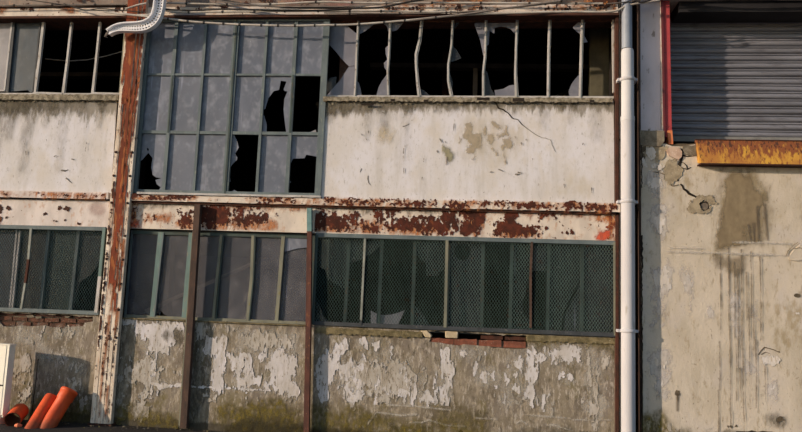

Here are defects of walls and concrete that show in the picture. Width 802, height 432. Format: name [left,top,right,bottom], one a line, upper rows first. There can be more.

corrosion [115,0,147,22]
corrosion [386,0,496,12]
corrosion [544,0,617,11]
crack [495,103,555,151]
corrosion [36,33,618,417]
spalling [640,144,697,241]
spalling [687,194,717,214]
peeling [0,225,184,423]
peeling [191,322,300,406]
peeling [314,333,610,431]
water stain [714,173,791,419]